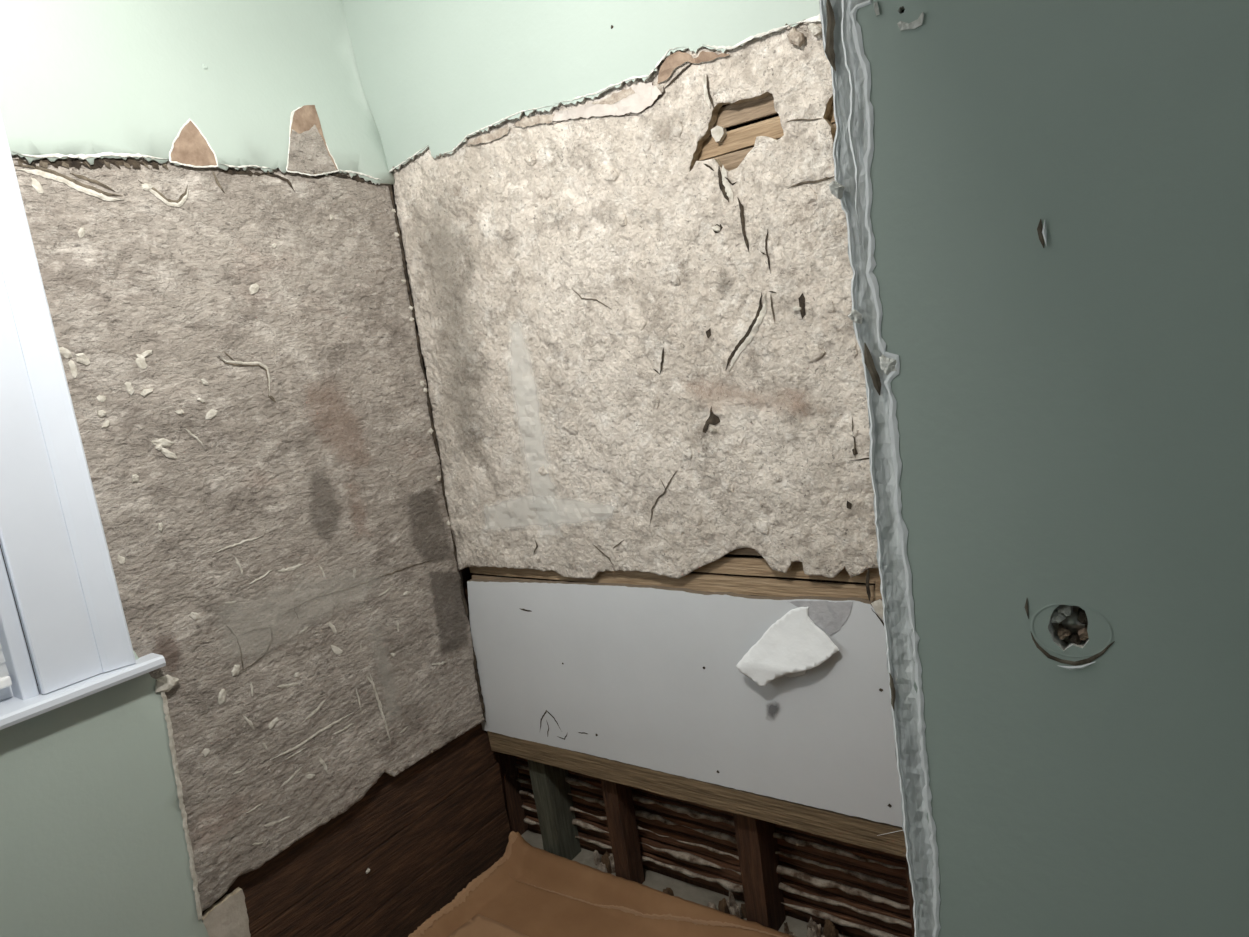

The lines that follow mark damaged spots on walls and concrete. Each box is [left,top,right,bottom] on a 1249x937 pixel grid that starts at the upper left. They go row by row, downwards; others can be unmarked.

flaking render [11,0,941,937]
spalling [1051,605,1089,645]